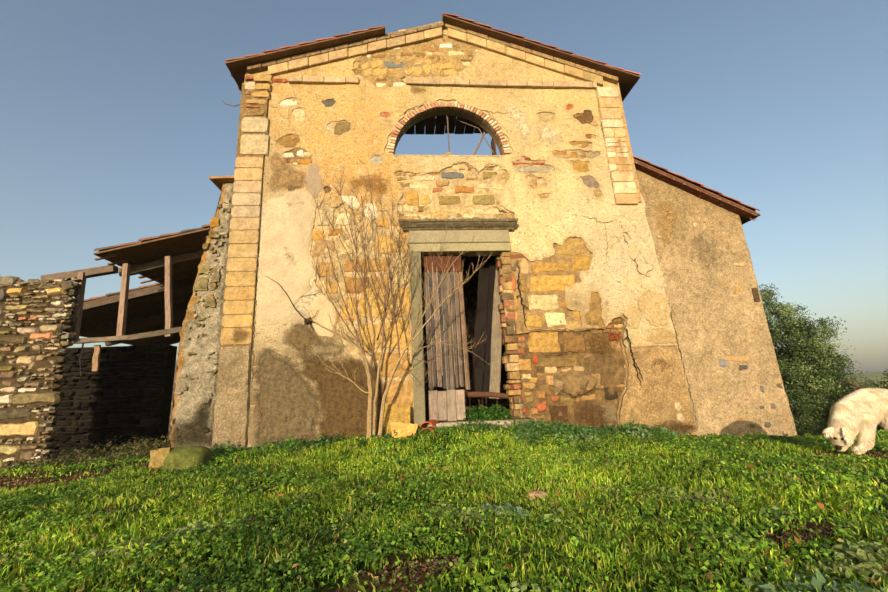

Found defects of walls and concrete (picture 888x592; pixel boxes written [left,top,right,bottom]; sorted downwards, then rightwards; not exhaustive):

spalling [352,34,478,87]
spalling [276,134,312,164]
spalling [308,105,602,422]
crack [589,218,654,277]
spalling [500,208,676,428]
damp [255,323,386,442]
crack [623,324,643,386]